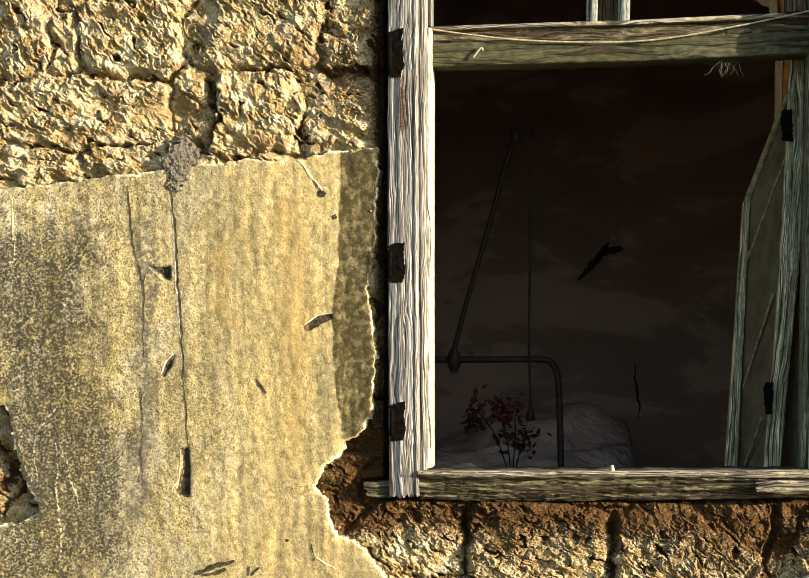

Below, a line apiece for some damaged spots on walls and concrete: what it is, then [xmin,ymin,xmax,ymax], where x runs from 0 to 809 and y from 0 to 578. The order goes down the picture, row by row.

spalling [0,0,388,213]
crack [127,189,155,358]
crack [137,388,145,487]
peeling [149,266,171,281]
crack [168,190,189,446]
spalling [315,211,809,578]